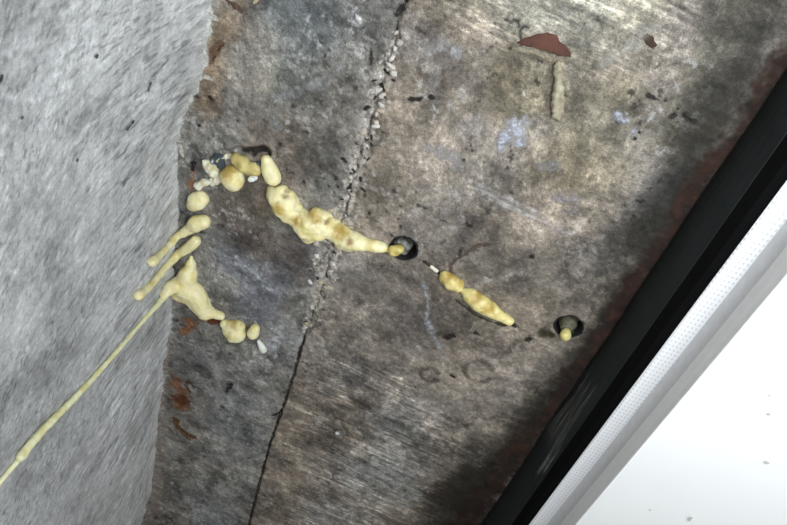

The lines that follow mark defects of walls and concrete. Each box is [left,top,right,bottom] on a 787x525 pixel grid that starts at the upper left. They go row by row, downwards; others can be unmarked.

crack [423,243,492,275]
leakage [422,0,787,525]
crack [455,300,517,328]
rust [171,377,197,440]
crack [248,243,334,525]